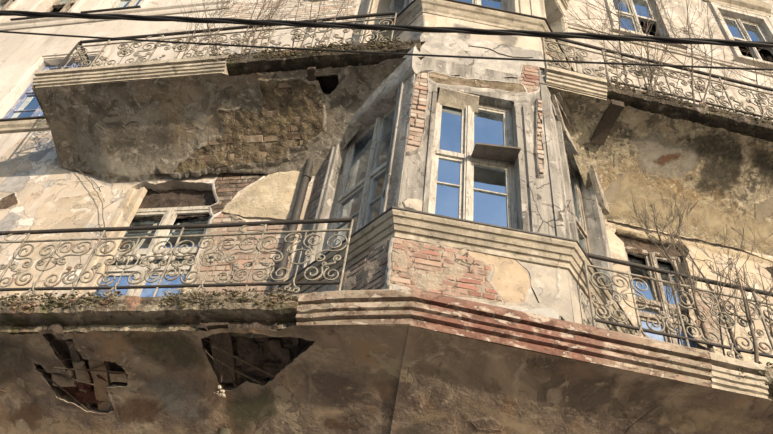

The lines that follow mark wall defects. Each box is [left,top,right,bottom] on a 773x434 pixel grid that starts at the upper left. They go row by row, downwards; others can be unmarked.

flaking render [0,135,55,231]
flaking render [133,76,330,296]
leakage [610,131,773,263]
flaking render [335,238,566,321]
leakage [0,404,41,434]
leakage [117,380,199,434]